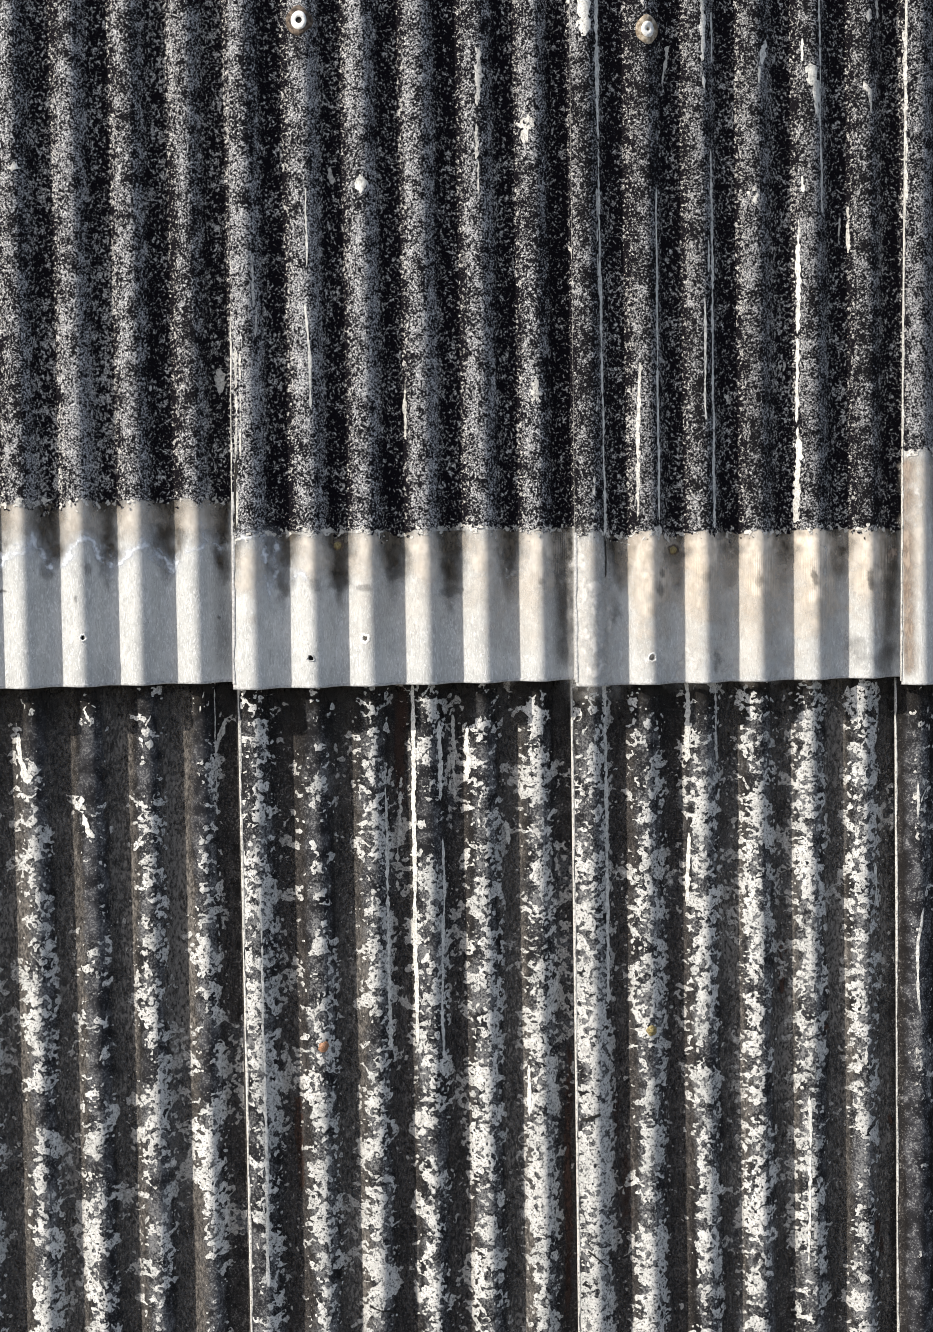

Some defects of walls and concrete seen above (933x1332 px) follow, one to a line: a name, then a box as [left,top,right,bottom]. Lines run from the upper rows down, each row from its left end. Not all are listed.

water stain [355,174,368,194]
water stain [304,304,312,407]
water stain [0,349,465,604]
water stain [910,465,926,563]
water stain [473,0,899,1332]
peeling [909,710,933,937]
peeling [0,679,895,1332]
peeling [908,1033,933,1103]